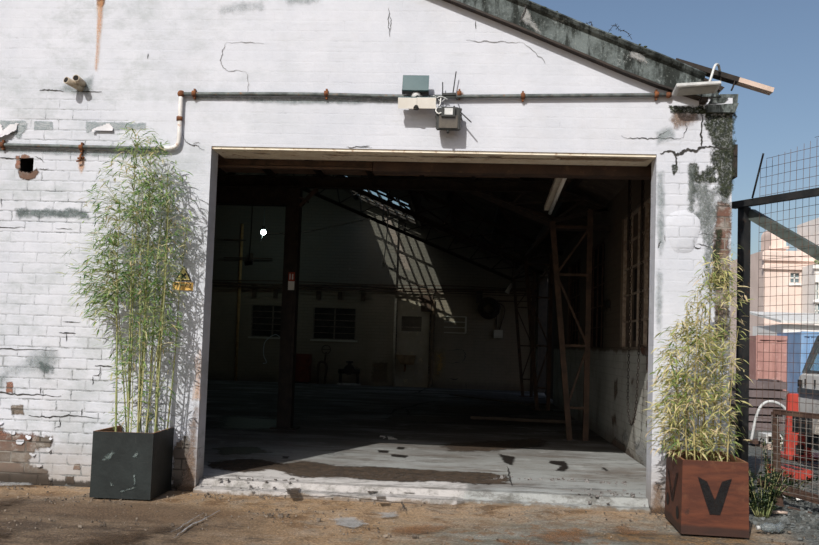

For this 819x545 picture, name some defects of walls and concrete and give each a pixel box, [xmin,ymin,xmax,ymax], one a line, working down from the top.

corrosion [97,0,105,42]
peeling [0,120,53,138]
peeling [86,121,146,133]
crack [621,115,731,166]
water stain [659,105,702,140]
spalling [15,154,39,180]
spalling [11,405,24,415]
spalling [0,422,53,486]